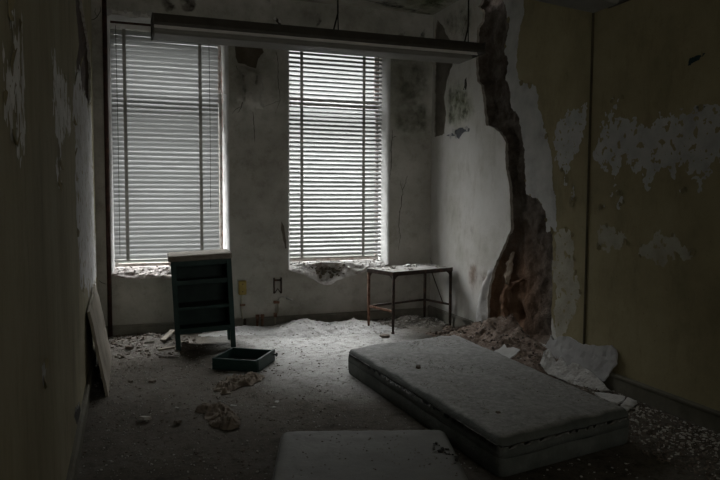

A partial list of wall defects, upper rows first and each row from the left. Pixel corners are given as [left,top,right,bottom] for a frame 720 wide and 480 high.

peeling [2,0,26,168]
peeling [51,0,97,296]
flaking render [235,46,264,68]
crack [390,130,407,250]
flaking render [434,62,470,140]
flaking render [476,0,588,345]
peeling [593,95,720,210]
spalling [112,266,171,279]
spalling [289,259,388,285]